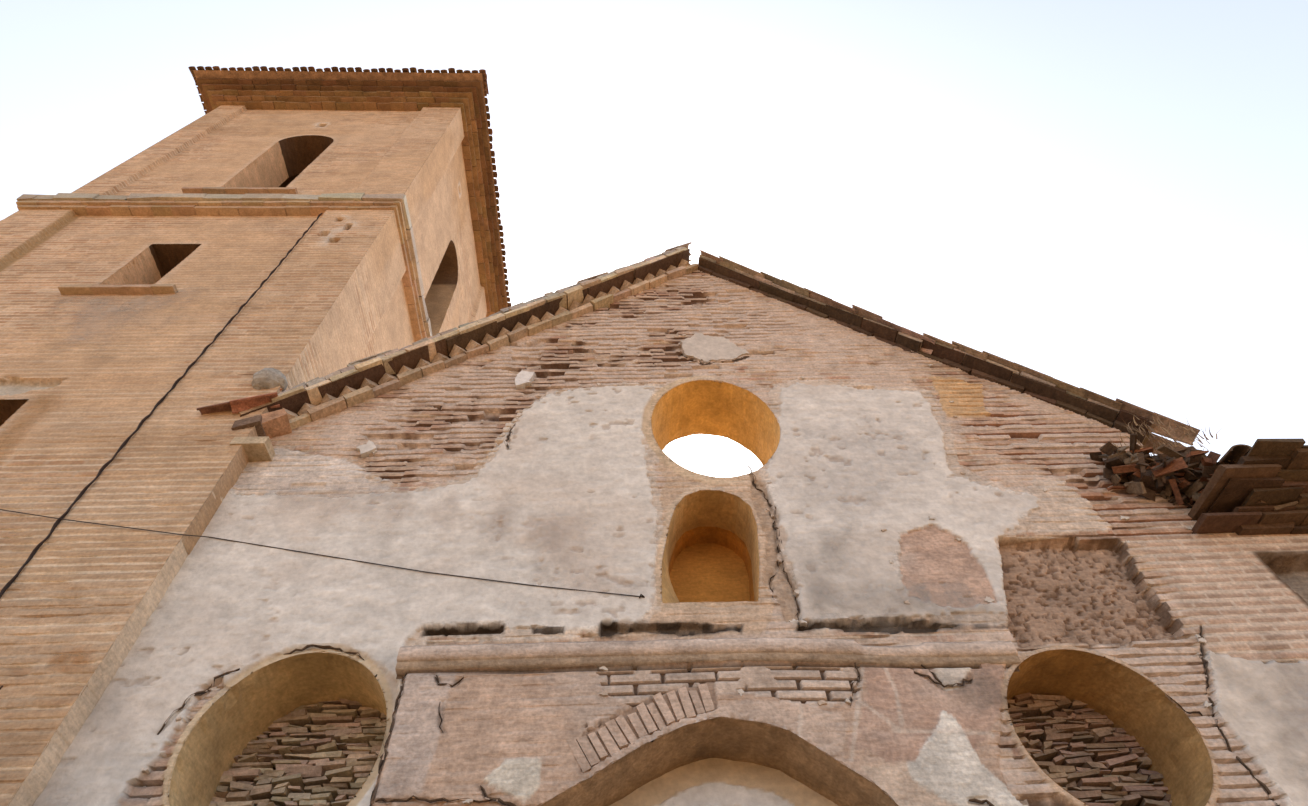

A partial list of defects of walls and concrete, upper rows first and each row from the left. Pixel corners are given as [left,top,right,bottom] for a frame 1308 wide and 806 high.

crack [748,465,800,620]
flaking render [290,270,1264,806]
flaking render [122,683,231,806]